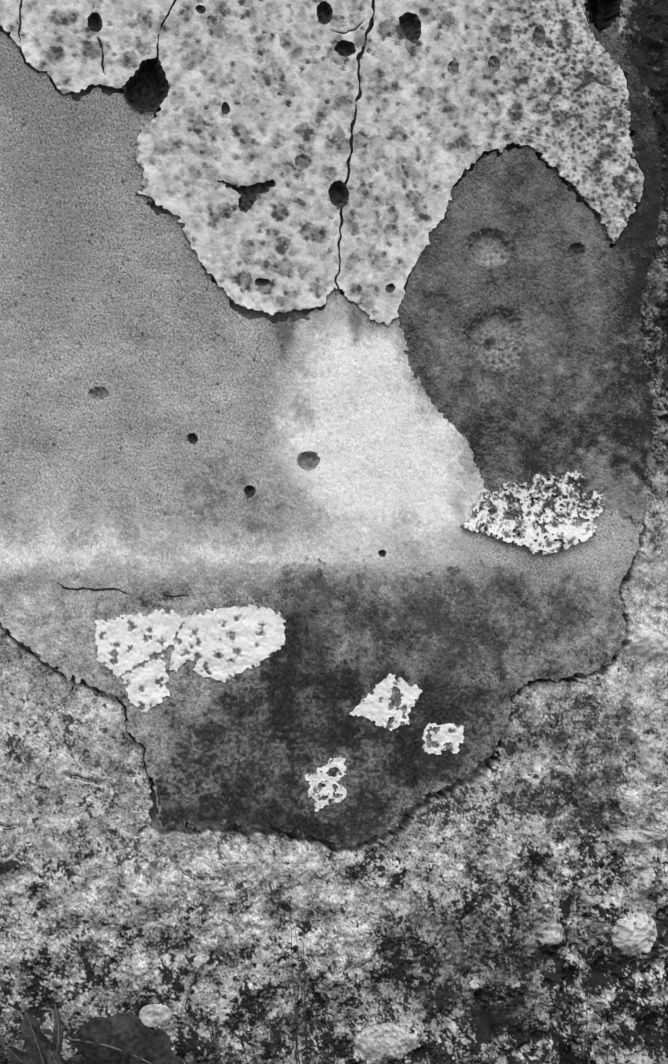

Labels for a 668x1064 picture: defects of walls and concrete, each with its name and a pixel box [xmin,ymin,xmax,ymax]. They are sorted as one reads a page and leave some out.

crack [156,0,177,57]
flaking render [0,0,668,555]
crack [334,0,375,292]
damp [0,301,583,846]
spalling [0,321,668,1064]
damp [510,692,650,848]